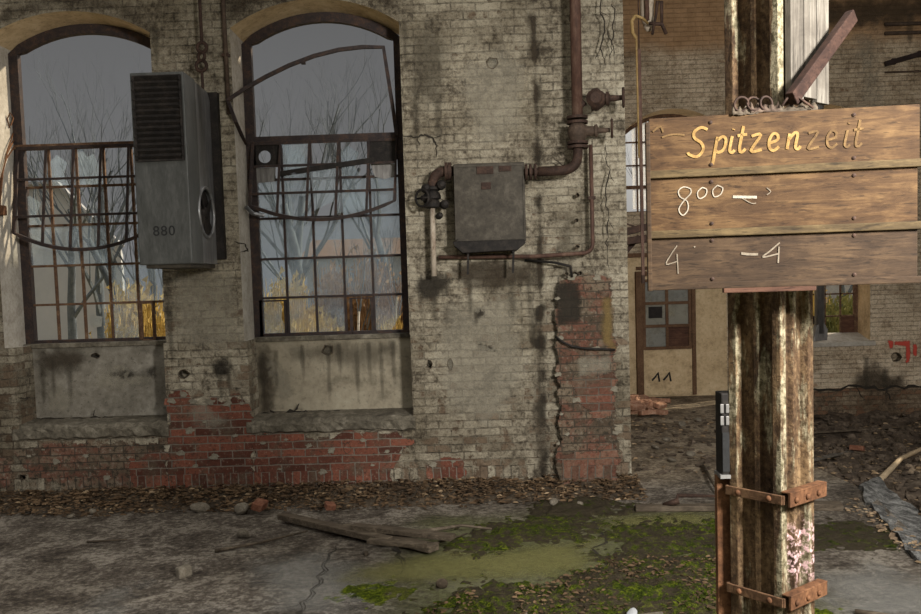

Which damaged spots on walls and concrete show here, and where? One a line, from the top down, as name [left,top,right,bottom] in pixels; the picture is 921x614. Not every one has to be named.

damp [40,351,82,369]
flaking render [13,369,414,492]
damp [259,352,272,412]
flaking render [554,273,623,484]